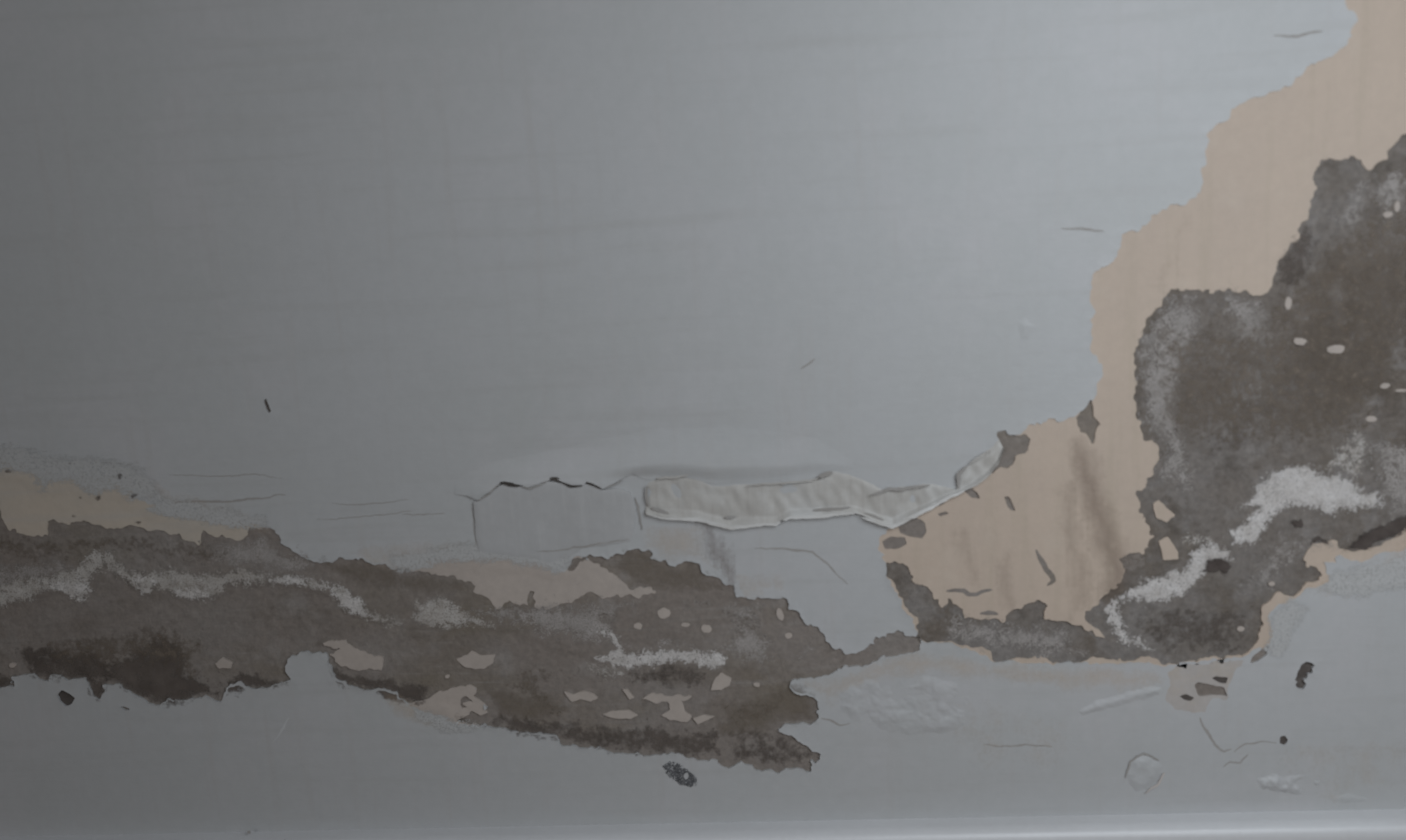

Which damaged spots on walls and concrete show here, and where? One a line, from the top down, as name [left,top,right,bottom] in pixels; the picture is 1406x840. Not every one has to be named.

damp [1328,168,1406,244]
peeling [878,0,1406,631]
damp [1136,288,1278,501]
crack [154,473,284,506]
crack [322,477,622,558]
flaking render [0,134,1406,773]
damp [1103,430,1406,652]
damp [0,491,826,684]
damp [22,634,277,704]
damp [333,669,427,704]
damp [493,672,717,754]
damp [936,606,1098,663]